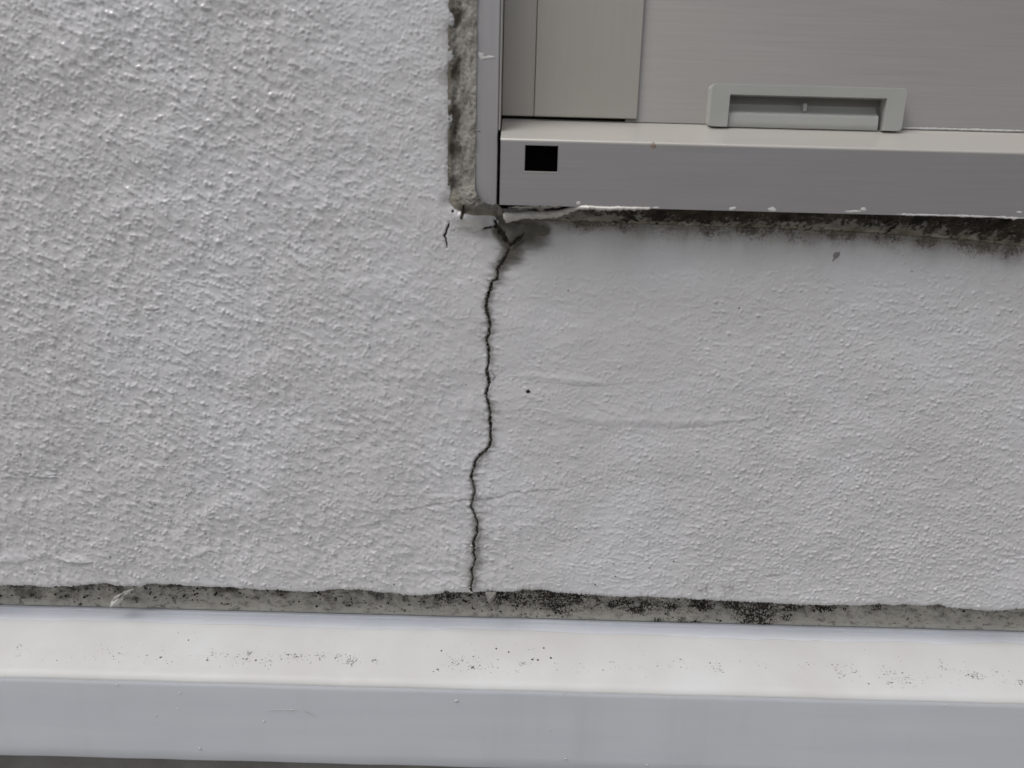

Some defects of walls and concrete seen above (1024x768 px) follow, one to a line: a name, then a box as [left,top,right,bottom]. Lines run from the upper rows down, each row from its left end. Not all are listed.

water stain [451,8,462,28]
water stain [451,57,461,80]
water stain [448,106,462,156]
water stain [492,221,550,258]
water stain [574,209,1024,255]
crack [469,219,524,593]
water stain [0,583,300,607]
water stain [310,589,849,625]